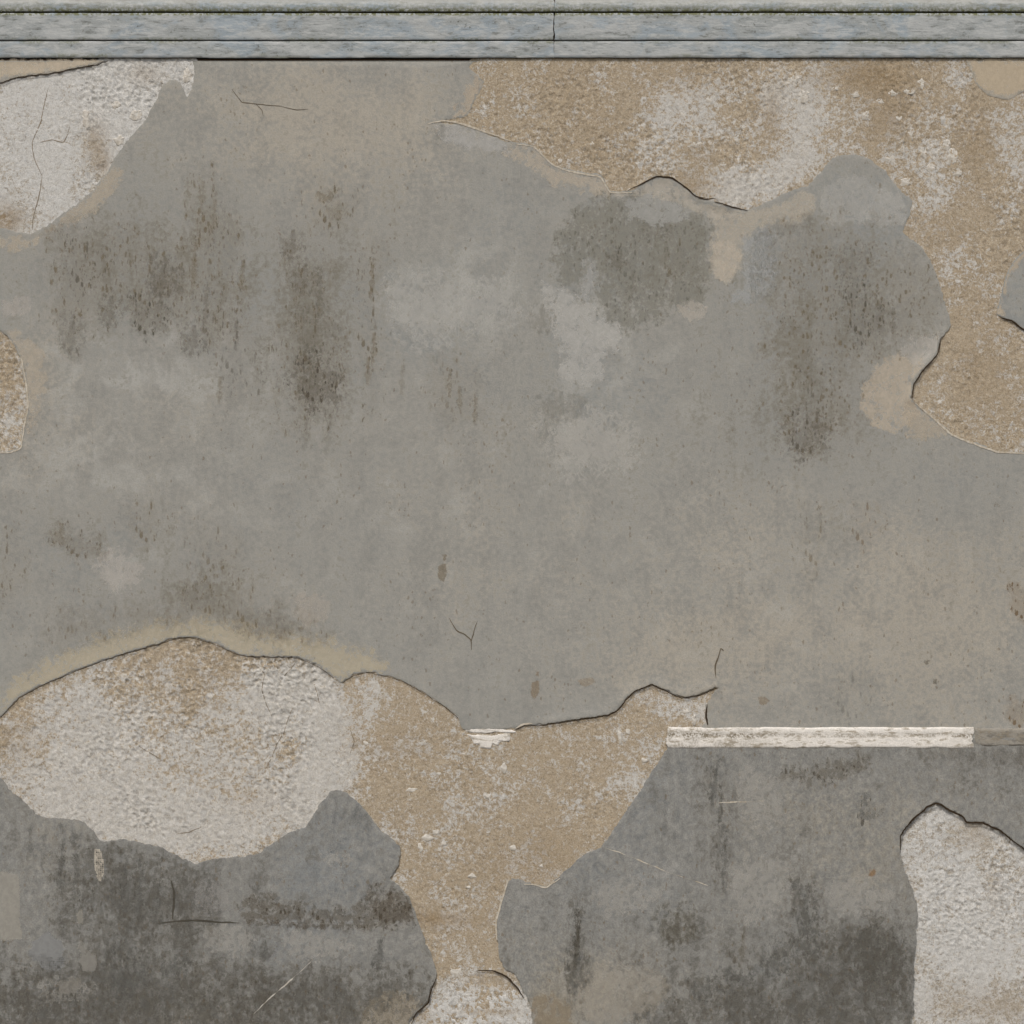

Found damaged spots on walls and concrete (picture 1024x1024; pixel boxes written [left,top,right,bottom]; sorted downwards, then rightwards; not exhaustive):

spalling [0,58,197,234]
crack [233,91,305,114]
spalling [428,58,1024,454]
spalling [0,331,29,453]
water stain [287,306,344,425]
crack [449,618,477,650]
spalling [0,637,718,1024]
water stain [241,883,411,929]
spalling [900,802,1024,1024]